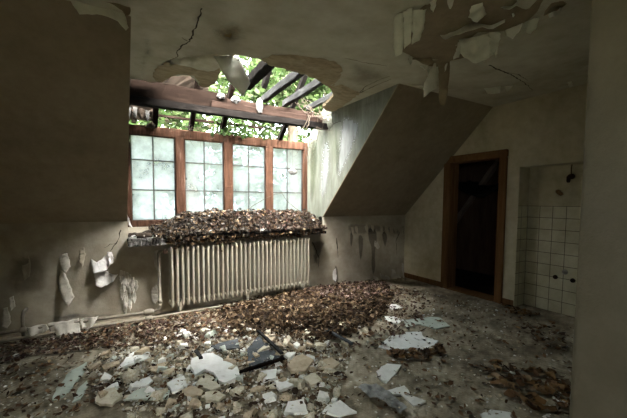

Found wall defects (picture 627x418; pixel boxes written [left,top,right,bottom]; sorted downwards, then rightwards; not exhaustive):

crack [173,8,202,59]
flaking render [153,53,221,87]
flaking render [260,54,360,112]
leakage [350,228,387,273]
peeling [58,253,74,306]
peeling [78,247,138,314]